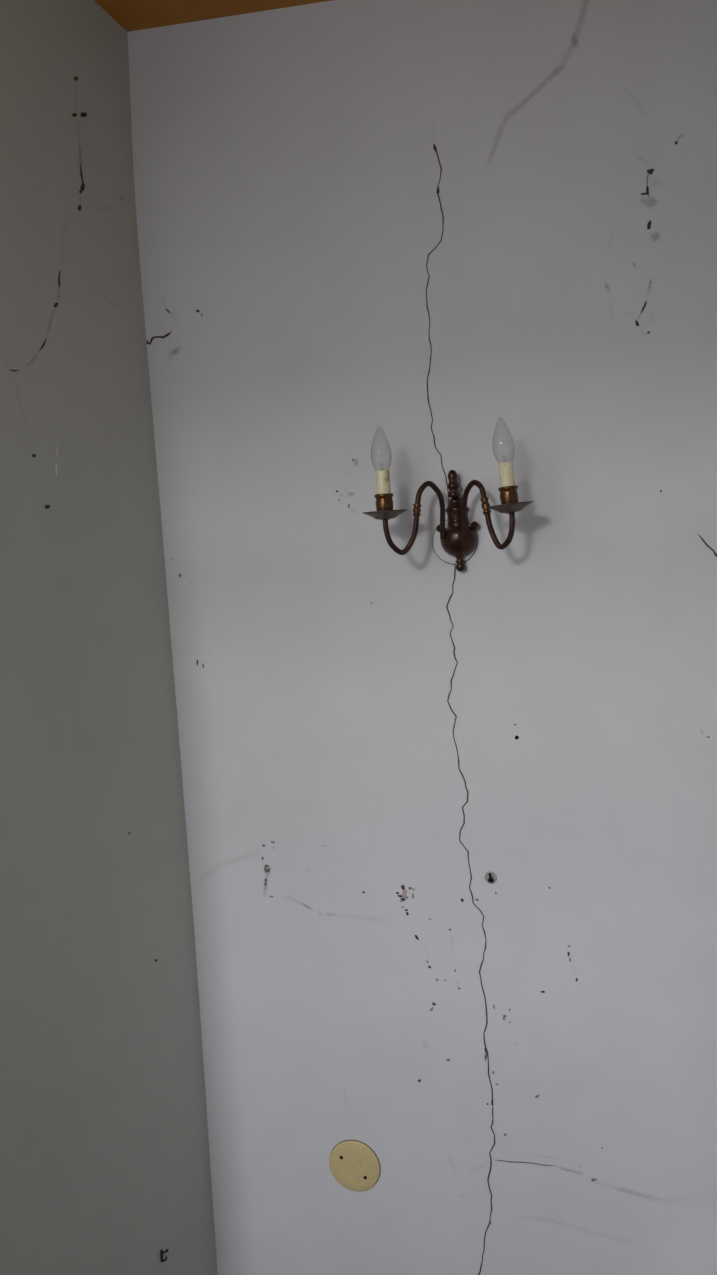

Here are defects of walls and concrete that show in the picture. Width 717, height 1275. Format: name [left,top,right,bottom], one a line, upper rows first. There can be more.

crack [426,144,449,503]
crack [415,564,555,1275]